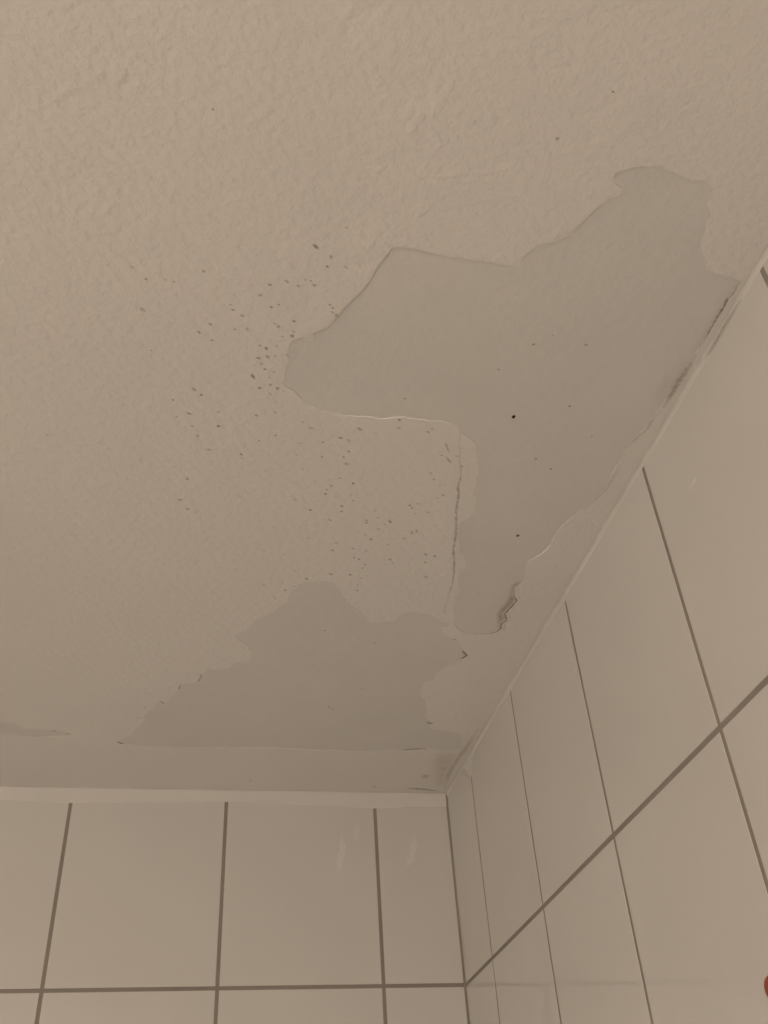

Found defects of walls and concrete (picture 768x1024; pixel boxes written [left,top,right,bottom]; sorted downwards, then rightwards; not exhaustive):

crack [444,433,464,613]